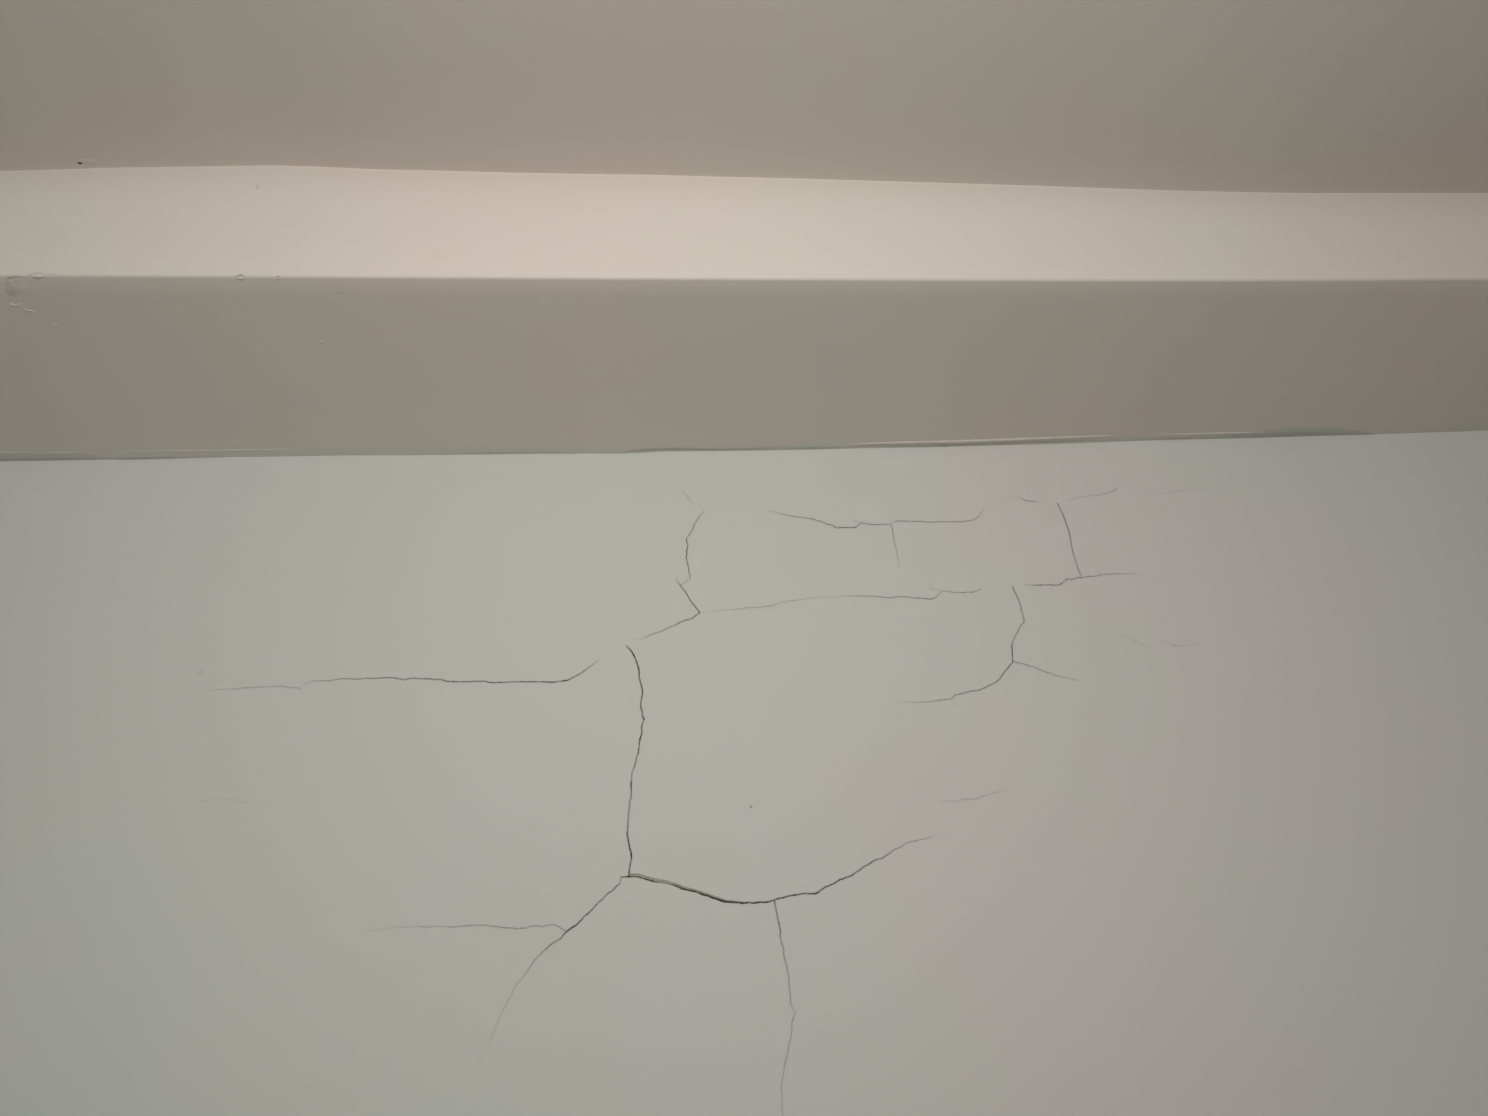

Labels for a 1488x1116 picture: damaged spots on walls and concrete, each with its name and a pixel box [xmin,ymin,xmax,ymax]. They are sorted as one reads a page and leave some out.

crack [628,648,645,791]
crack [566,831,885,932]